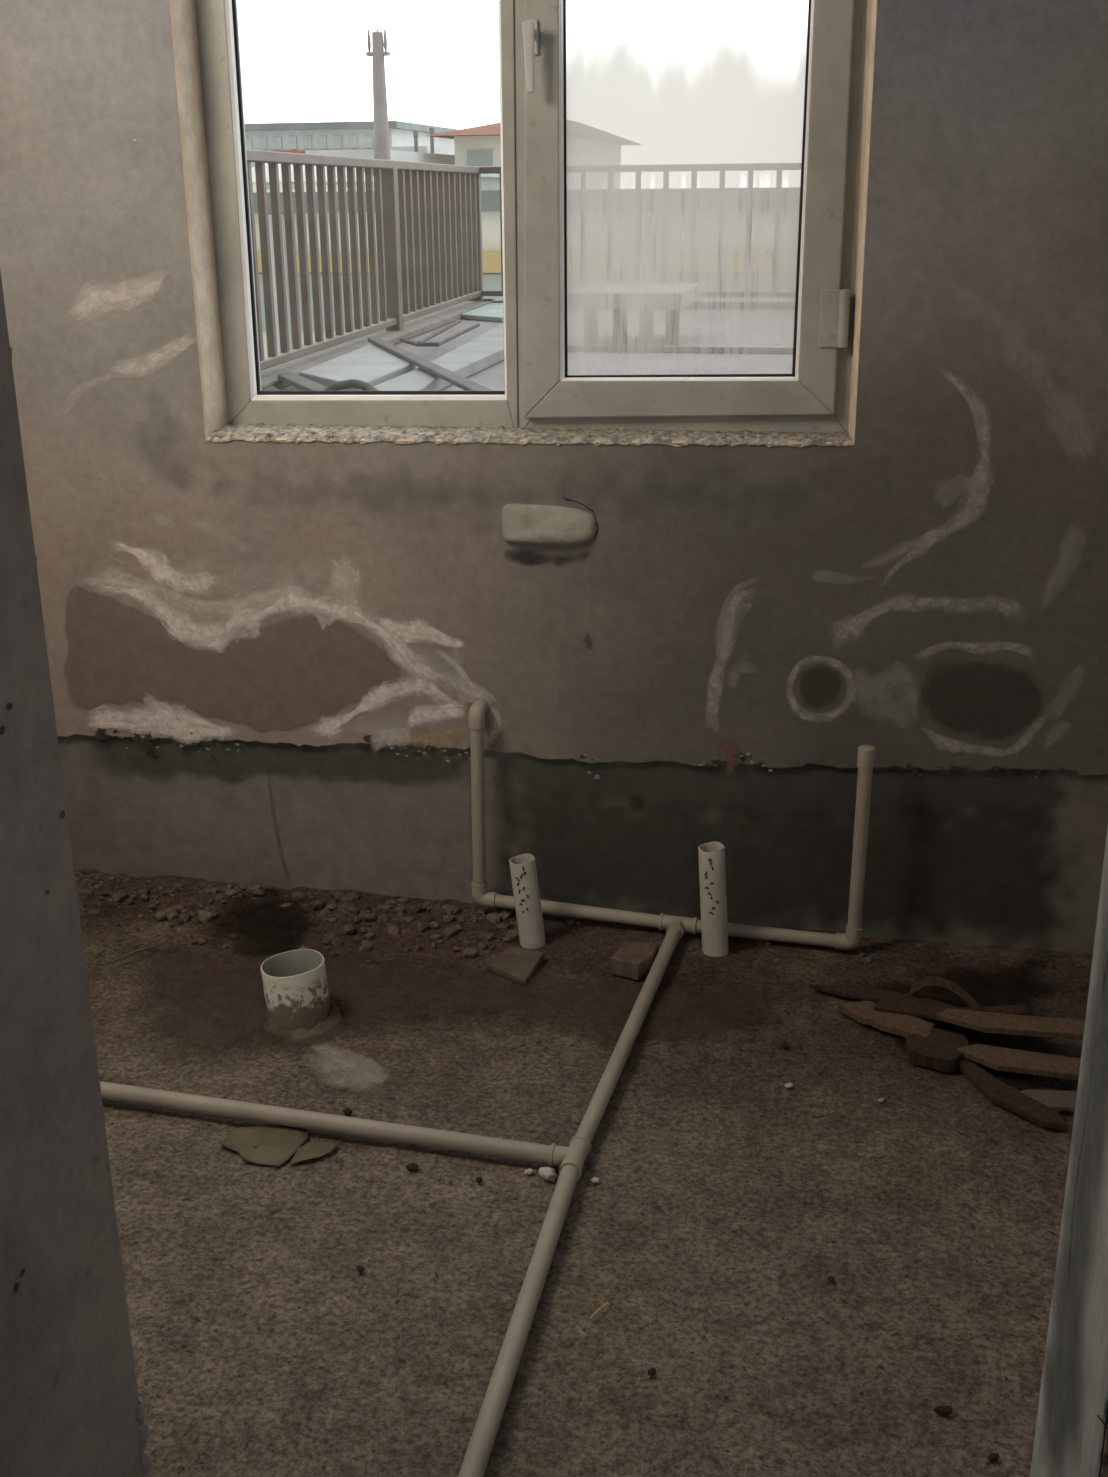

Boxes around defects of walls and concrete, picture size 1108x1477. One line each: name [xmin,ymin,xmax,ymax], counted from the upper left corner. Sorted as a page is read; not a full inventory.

water stain [889,371,990,576]
water stain [707,591,746,723]
water stain [789,598,1018,721]
flaking render [94,728,240,753]